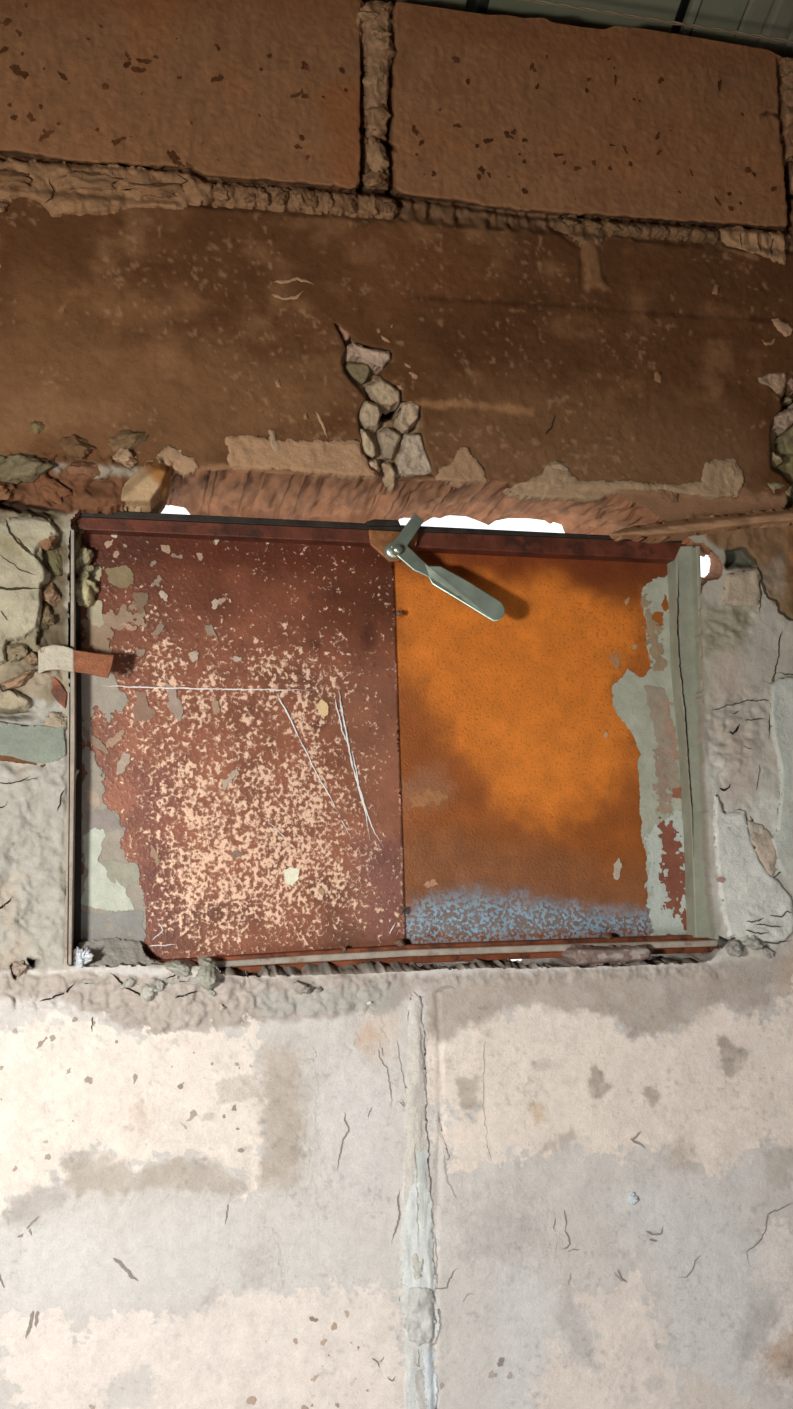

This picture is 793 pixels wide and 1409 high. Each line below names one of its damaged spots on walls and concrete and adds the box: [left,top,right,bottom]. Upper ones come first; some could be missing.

spalling [337,324,432,493]
spalling [747,369,793,498]
peeling [609,575,687,936]
rust [640,594,687,931]
crack [713,559,793,828]
water stain [0,1032,321,1238]
crack [746,1204,789,1261]